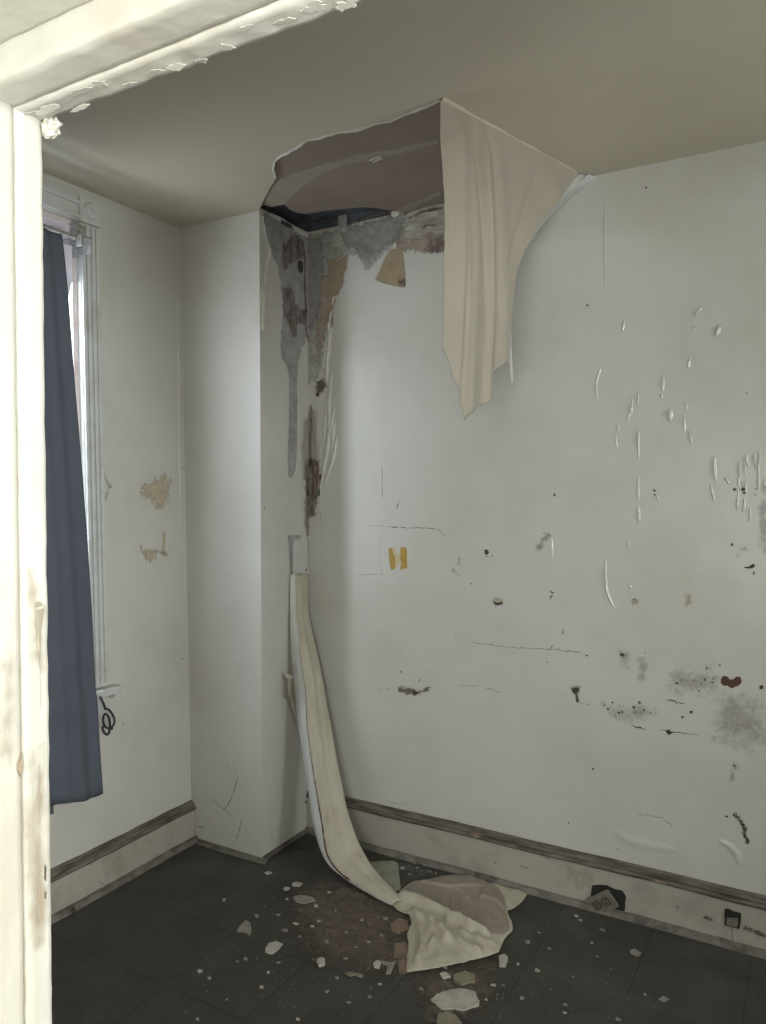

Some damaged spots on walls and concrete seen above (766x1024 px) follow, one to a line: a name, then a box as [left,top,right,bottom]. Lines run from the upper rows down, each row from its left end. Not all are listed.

peeling [273,0,359,24]
peeling [123,58,208,87]
peeling [24,80,108,116]
peeling [260,97,599,478]
peeling [283,535,527,975]